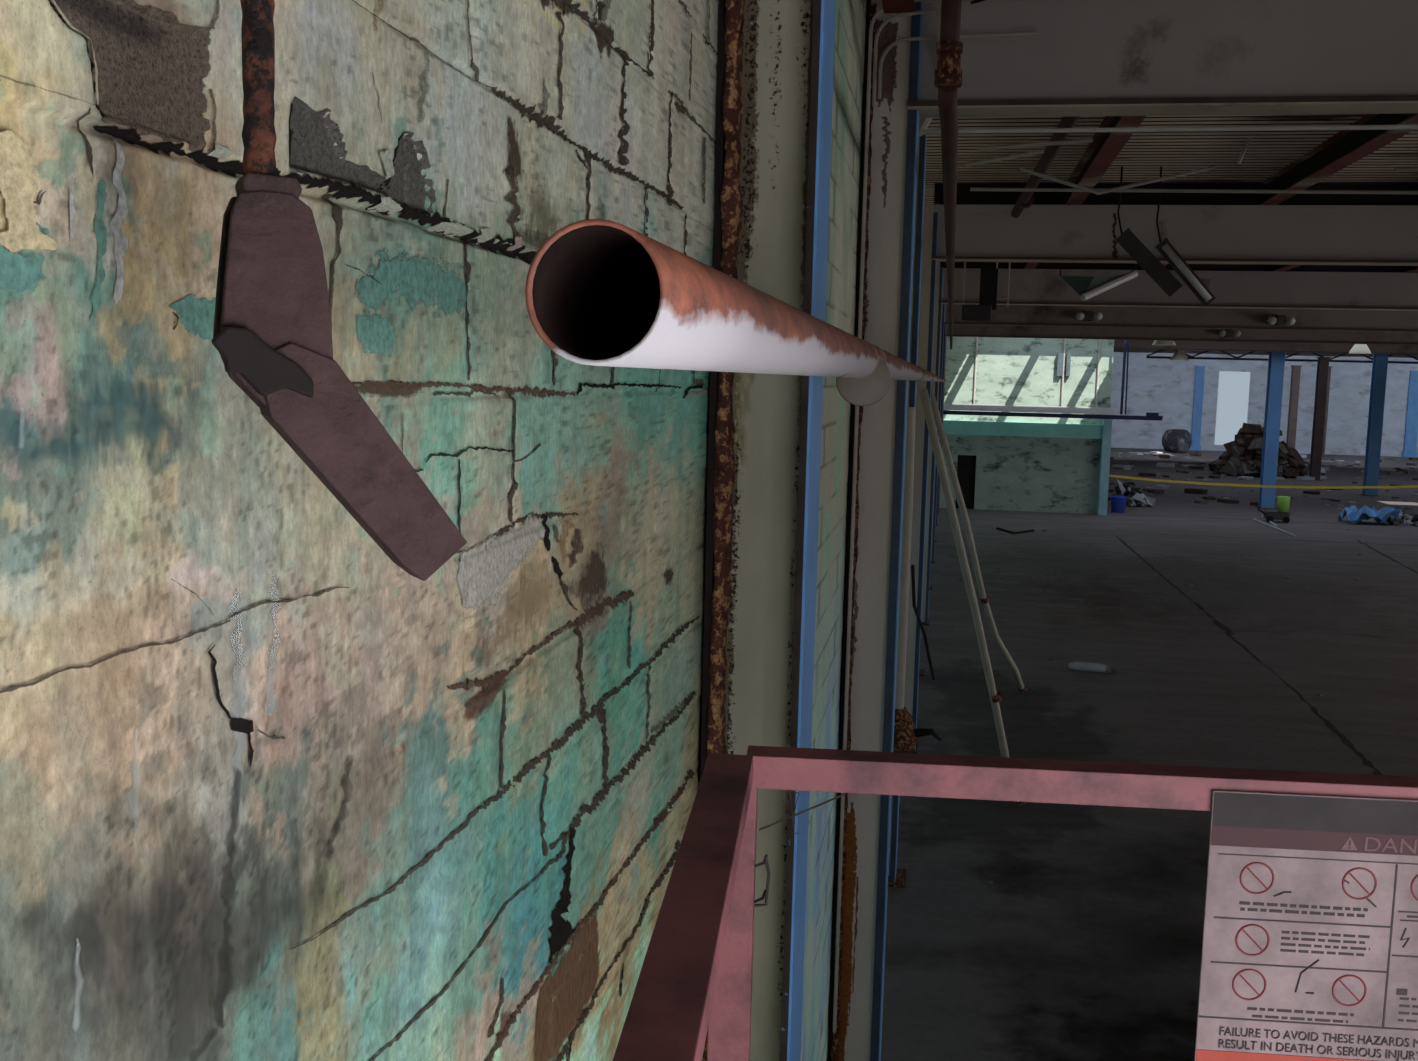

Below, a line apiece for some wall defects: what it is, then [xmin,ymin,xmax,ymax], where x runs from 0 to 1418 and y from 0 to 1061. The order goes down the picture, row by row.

peeling [0,130,59,298]
spalling [48,0,211,151]
crack [208,0,220,31]
spalling [289,97,449,217]
crack [352,0,718,255]
rust [737,0,814,311]
peeling [170,294,216,341]
crack [76,89,700,1061]
peeling [456,516,545,610]
rust [724,372,743,754]
crack [0,579,350,766]
rust [838,793,859,1061]